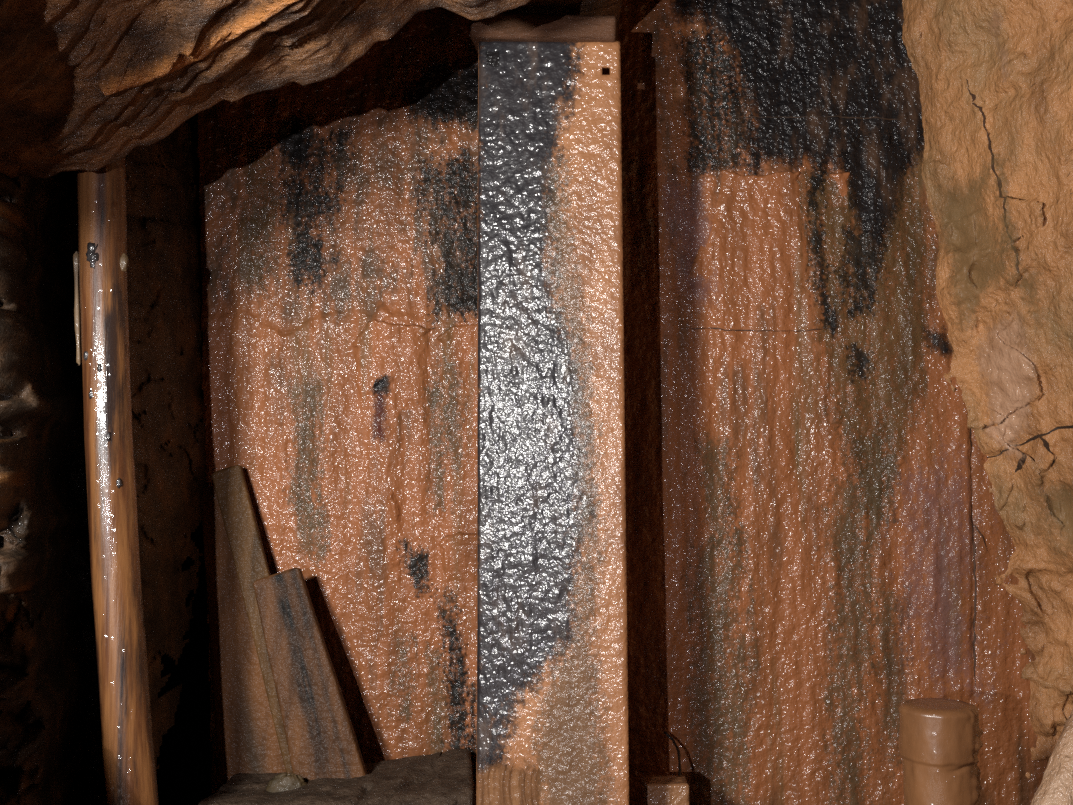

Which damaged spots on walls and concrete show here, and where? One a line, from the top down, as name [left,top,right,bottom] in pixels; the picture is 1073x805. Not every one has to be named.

water stain [239,110,355,300]
crack [966,79,1019,289]
water stain [391,41,596,782]
water stain [673,0,953,805]
crack [969,410,1073,683]